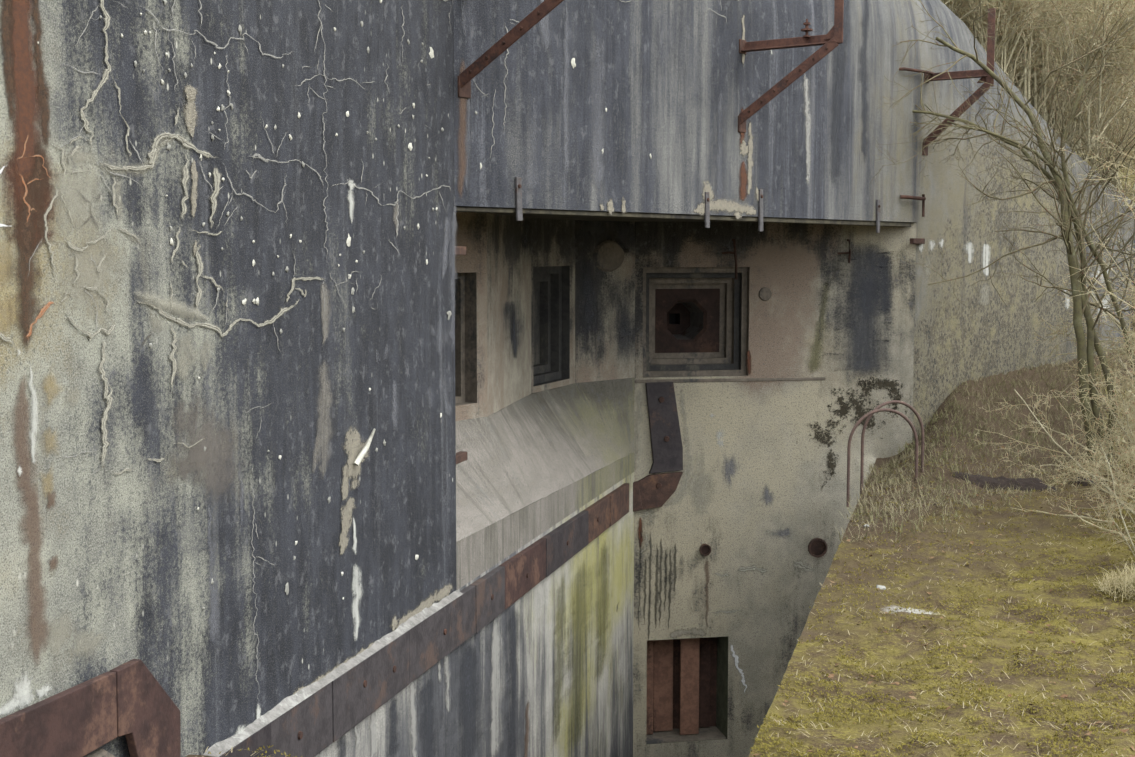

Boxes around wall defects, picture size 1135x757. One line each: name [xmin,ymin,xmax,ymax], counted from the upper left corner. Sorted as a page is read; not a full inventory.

corrosion [1,0,54,344]
crack [0,0,451,478]
damp [505,302,519,357]
damp [540,0,569,173]
damp [593,42,605,186]
corrosion [740,161,748,200]
damp [832,0,849,178]
damp [860,0,868,156]
damp [845,246,891,374]
corrosion [15,383,57,658]
spalling [339,428,369,554]
damp [637,532,676,639]